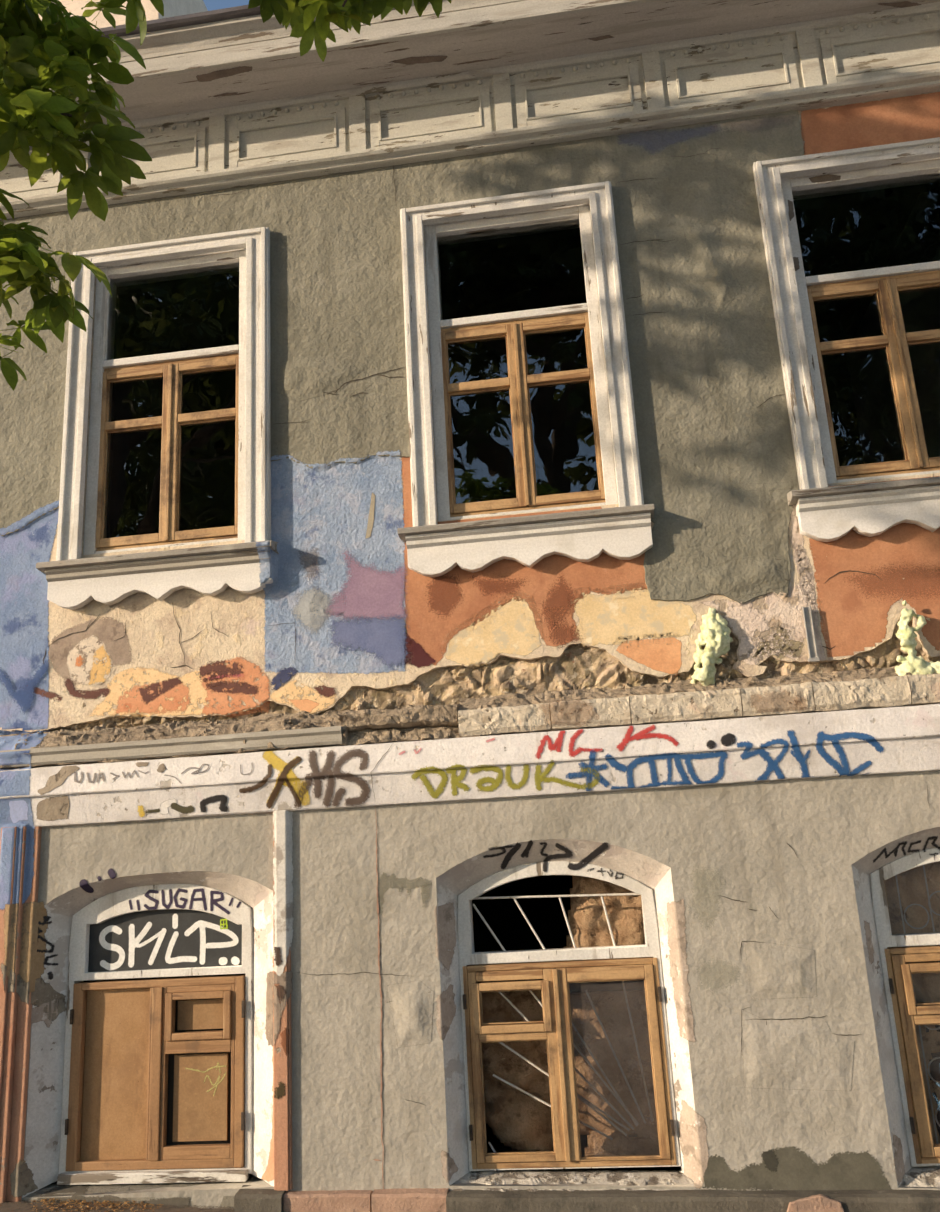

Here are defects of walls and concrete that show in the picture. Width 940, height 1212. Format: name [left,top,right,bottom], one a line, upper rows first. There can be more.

peeling [393,56,447,65]
crack [323,367,404,397]
crack [171,603,230,669]
peeling [445,596,541,667]
peeling [573,505,826,676]
peeling [269,680,335,714]
peeling [0,901,67,1028]
peeling [261,810,294,1181]
peeling [434,902,456,1041]
peeling [667,899,696,1042]
peeling [679,1100,709,1189]
water stain [703,1145,892,1191]